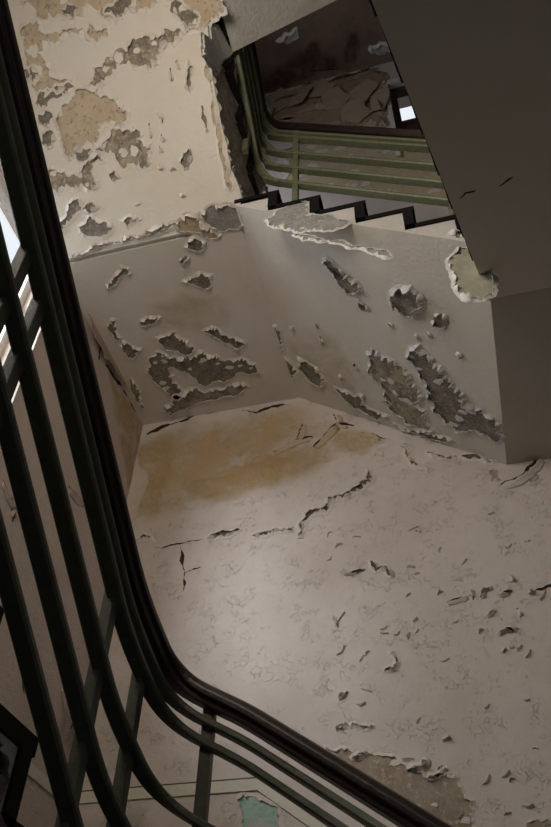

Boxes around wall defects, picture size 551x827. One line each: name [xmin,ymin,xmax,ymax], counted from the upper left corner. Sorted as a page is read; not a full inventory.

peeling [17,0,269,267]
peeling [265,66,392,127]
peeling [264,201,394,261]
peeling [320,256,369,312]
peeling [387,285,426,321]
peeling [445,229,499,304]
peeling [105,317,261,418]
peeling [272,313,506,481]
peeling [204,466,376,543]
peeling [343,559,395,579]
peeling [469,575,517,600]
peeling [323,744,477,827]